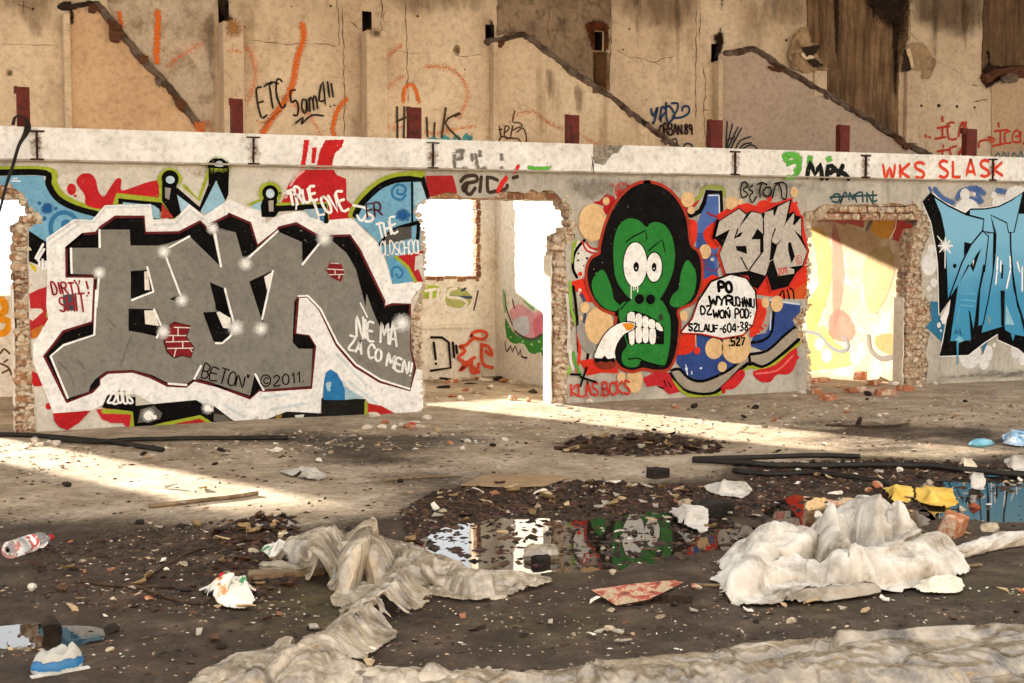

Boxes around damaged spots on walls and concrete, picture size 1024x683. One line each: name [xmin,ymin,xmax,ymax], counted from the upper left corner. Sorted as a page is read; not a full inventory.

spalling [723,46,932,155]
spalling [980,65,1024,85]
flaking render [0,183,43,432]
flaking render [410,189,578,410]
flaking render [792,200,931,391]